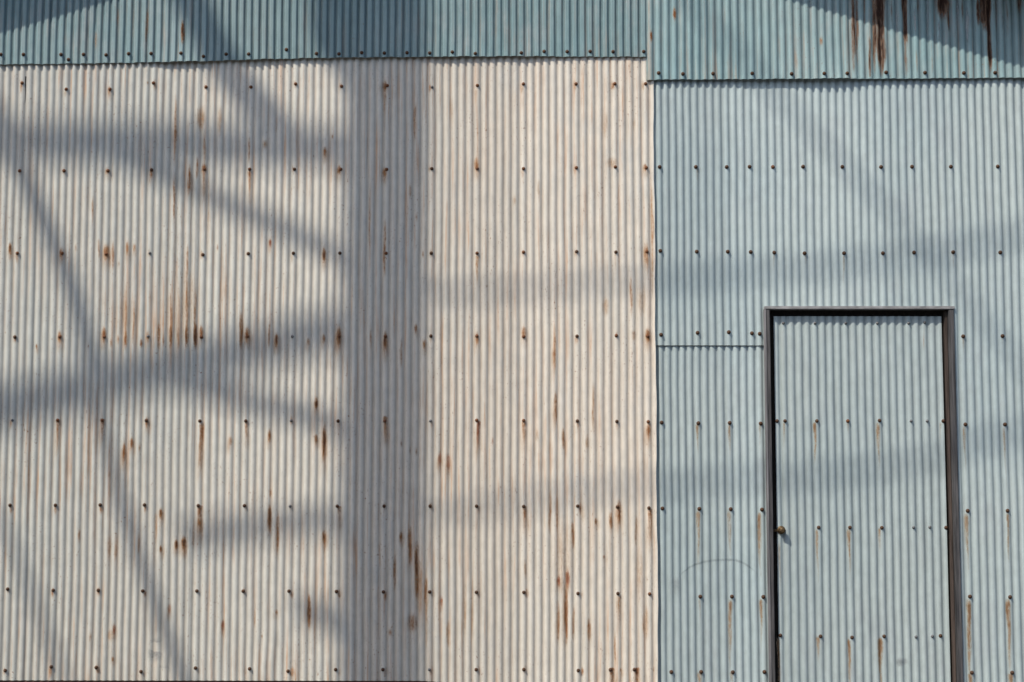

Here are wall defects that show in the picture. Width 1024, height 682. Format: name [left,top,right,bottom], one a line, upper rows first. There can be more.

corrosion [851,0,907,75]
corrosion [937,0,949,28]
corrosion [976,0,992,68]
corrosion [158,290,203,347]
corrosion [400,532,427,599]
corrosion [557,572,574,637]